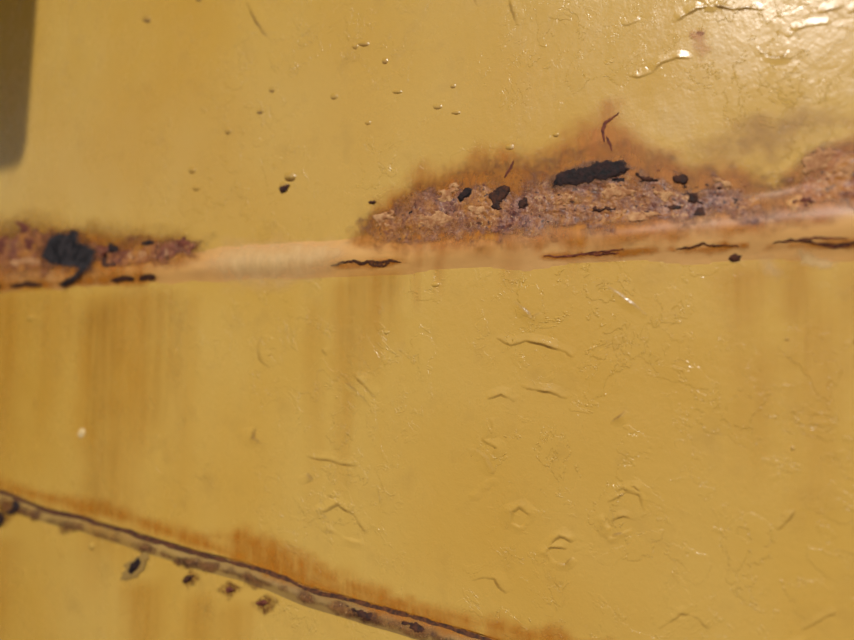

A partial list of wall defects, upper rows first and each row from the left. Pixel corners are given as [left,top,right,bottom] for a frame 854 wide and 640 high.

corrosion [362,123,854,257]
corrosion [0,221,198,290]
corrosion [139,543,328,603]
corrosion [327,594,467,640]